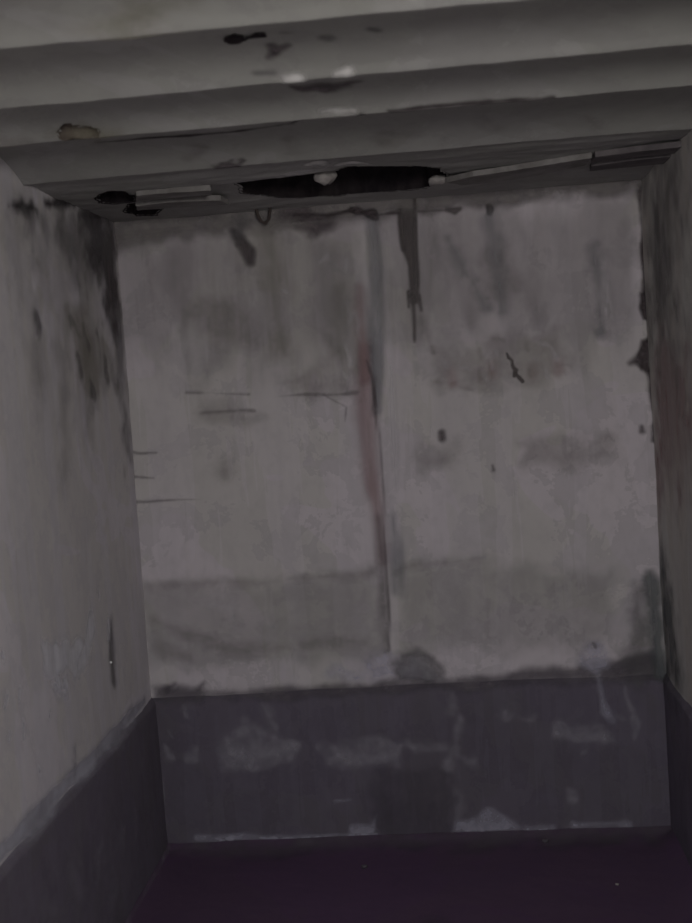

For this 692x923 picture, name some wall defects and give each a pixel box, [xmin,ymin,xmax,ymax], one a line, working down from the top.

spalling [234,161,450,198]
water stain [72,179,642,341]